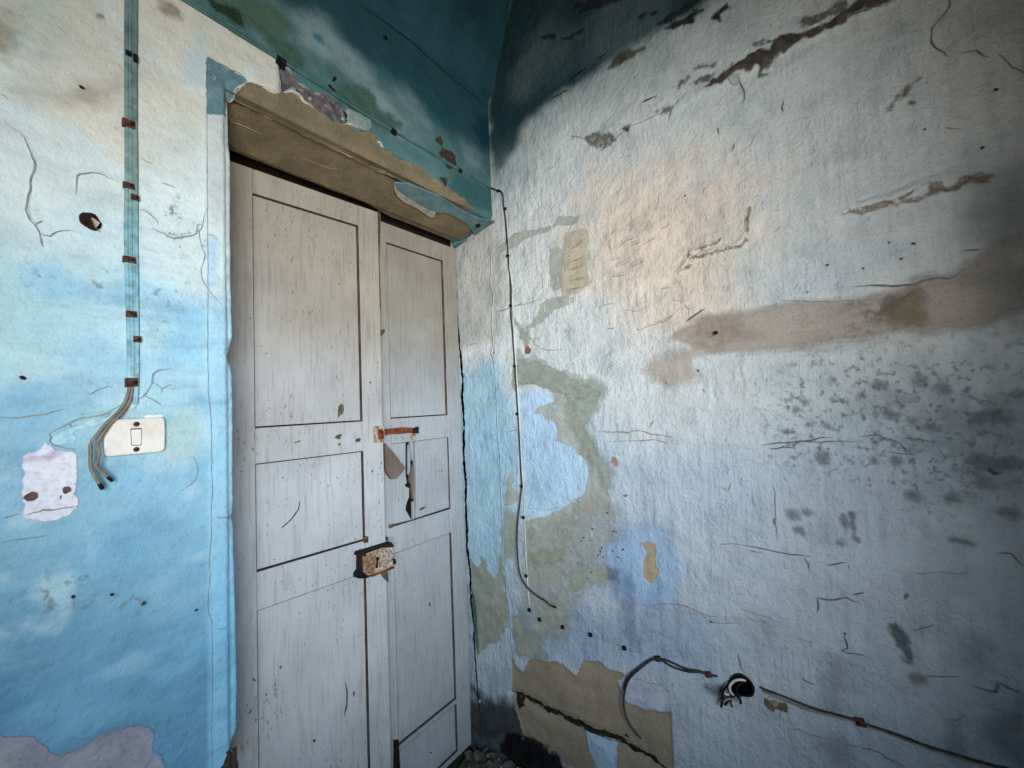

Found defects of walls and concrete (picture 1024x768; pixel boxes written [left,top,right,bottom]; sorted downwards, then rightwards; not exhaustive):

flaking render [576,0,890,148]
crack [1,94,81,247]
crack [73,170,118,194]
flaking render [205,57,495,249]
flaking render [929,175,991,194]
leakage [654,201,1024,386]
peeling [471,216,612,652]
crack [457,243,651,733]
leakage [785,382,829,464]
peeling [642,542,659,583]
peeling [0,725,167,768]
flaking render [501,658,674,768]